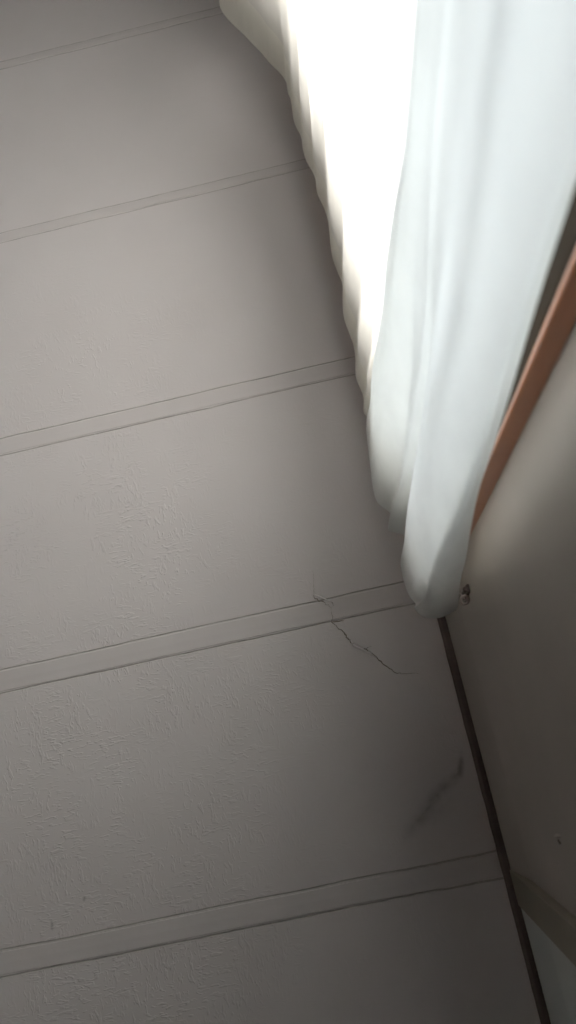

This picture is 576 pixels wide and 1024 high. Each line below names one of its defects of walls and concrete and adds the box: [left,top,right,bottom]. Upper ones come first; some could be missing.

crack [313,570,418,674]